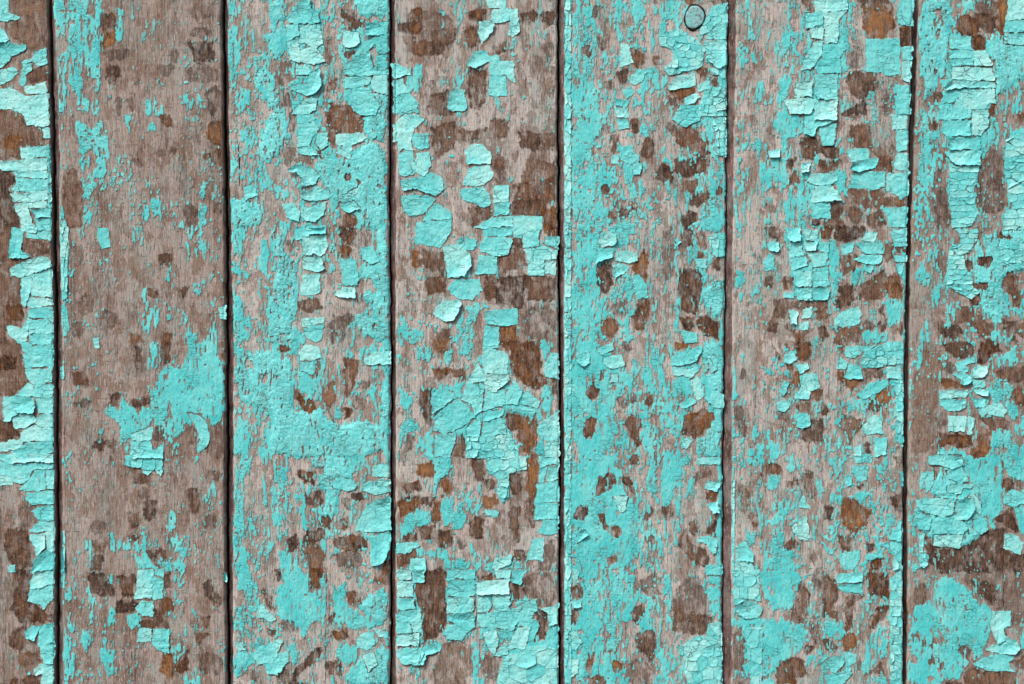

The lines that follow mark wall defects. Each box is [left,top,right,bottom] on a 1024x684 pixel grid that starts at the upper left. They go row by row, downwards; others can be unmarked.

peeling [0,0,228,684]
peeling [53,0,728,684]
peeling [731,0,1024,684]